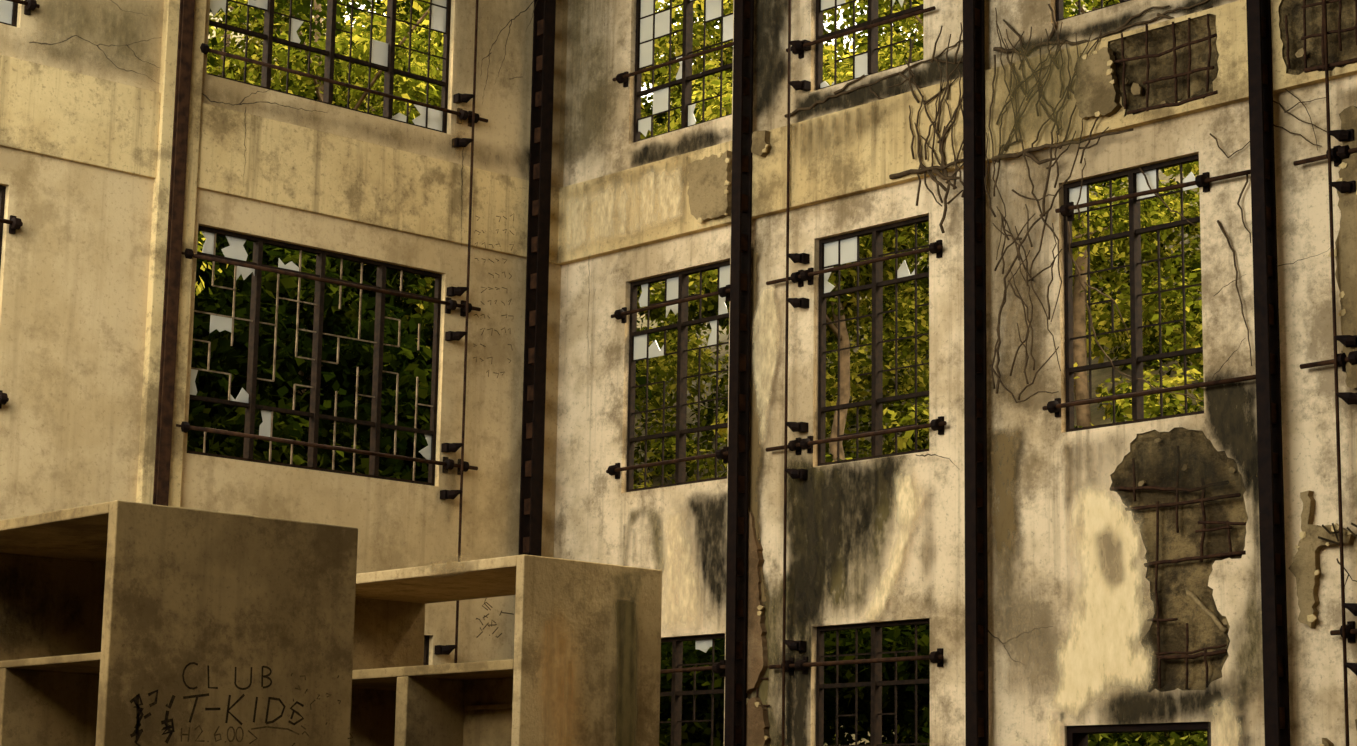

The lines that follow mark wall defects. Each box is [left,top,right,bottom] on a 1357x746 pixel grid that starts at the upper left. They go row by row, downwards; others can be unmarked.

damp [792,55,963,140]
spalling [1074,14,1219,120]
spalling [1278,0,1357,75]
damp [748,248,777,542]
damp [1136,374,1259,513]
damp [629,495,727,624]
damp [748,455,922,746]
damp [988,428,1263,746]
spalling [1109,427,1248,693]
peeling [1288,491,1355,629]